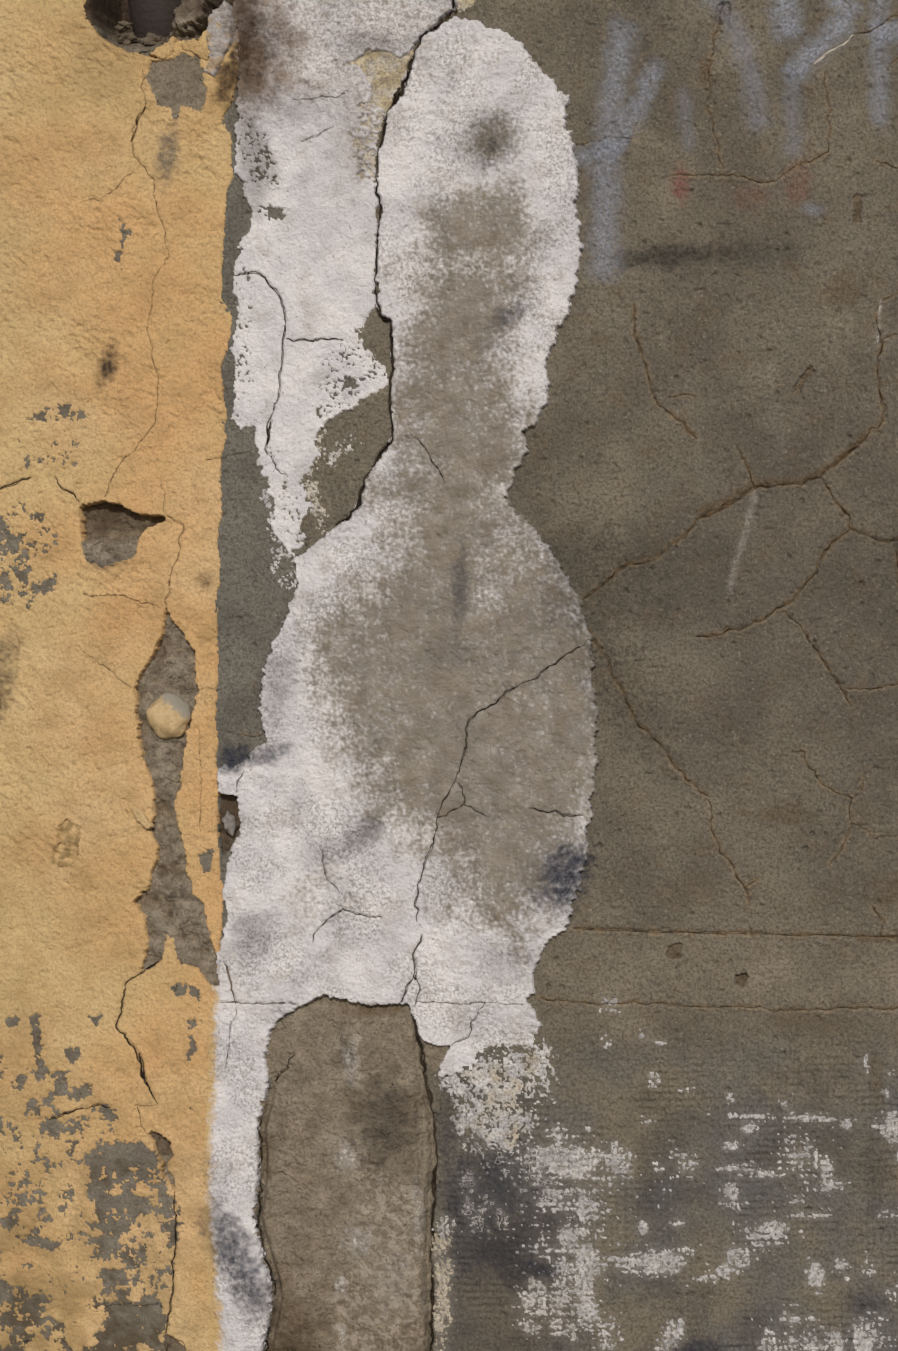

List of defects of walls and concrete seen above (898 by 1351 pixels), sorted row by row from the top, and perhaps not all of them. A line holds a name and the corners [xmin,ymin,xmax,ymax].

peeling [0,502,58,621]
crack [0,70,169,501]
flaking render [82,502,166,568]
peeling [257,204,286,221]
crack [206,271,343,477]
peeling [259,327,386,590]
flaking render [136,613,241,1002]
crack [399,293,898,1351]
crack [51,961,159,1133]
crack [220,961,297,1068]
peeling [0,1013,186,1351]
crack [256,1119,314,1351]